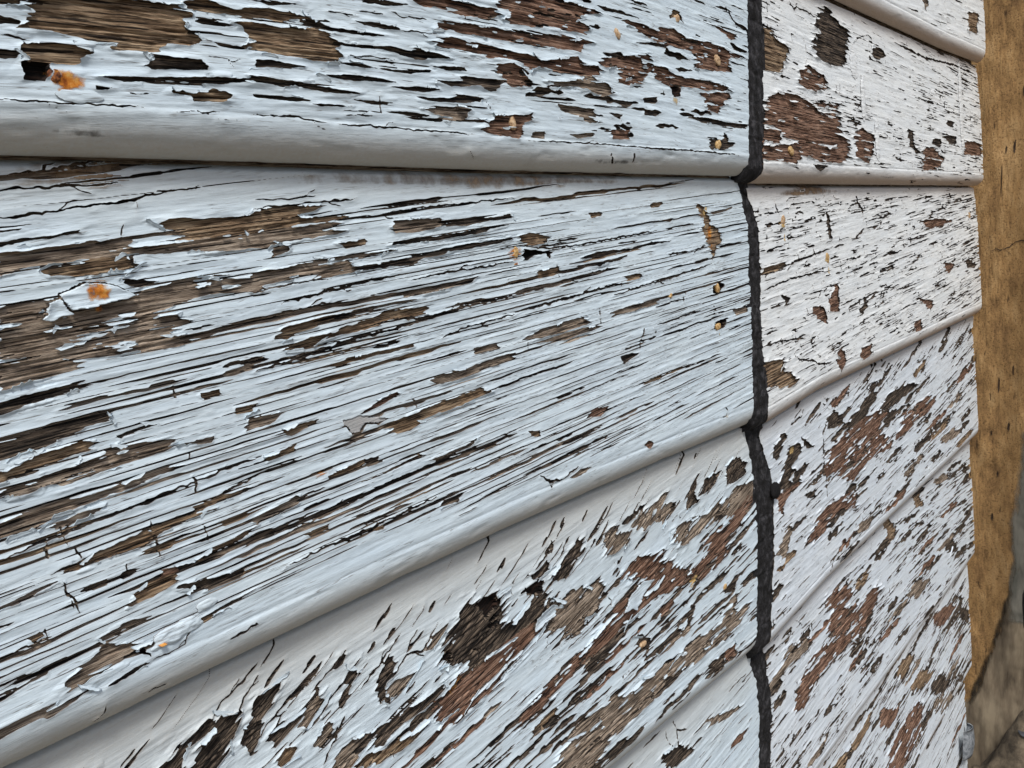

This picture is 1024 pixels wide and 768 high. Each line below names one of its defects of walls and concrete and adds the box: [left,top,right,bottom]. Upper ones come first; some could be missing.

rust [55,70,84,90]
peeling [0,0,748,151]
crack [172,0,673,82]
crack [486,0,746,155]
peeling [762,6,875,171]
rust [87,281,110,311]
crack [0,179,751,702]
crack [754,22,982,768]
peeling [806,381,936,544]
crack [255,459,756,768]
peeling [332,456,753,768]
peeling [159,653,364,768]